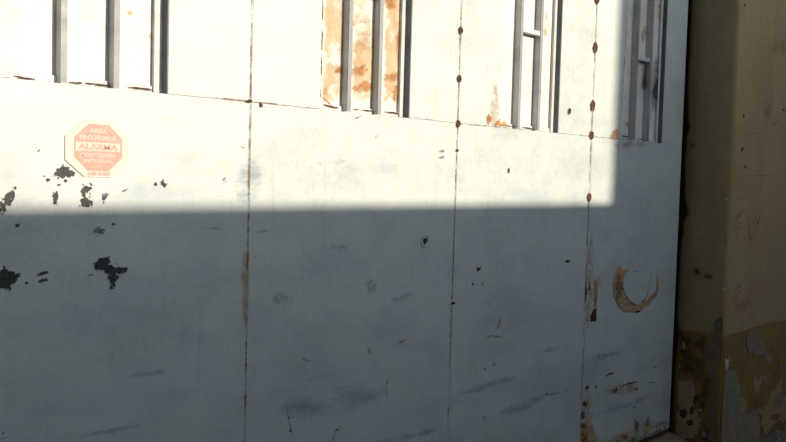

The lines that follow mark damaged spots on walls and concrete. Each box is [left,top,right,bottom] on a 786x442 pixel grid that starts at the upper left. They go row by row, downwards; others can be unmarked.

rust [224,24,277,108]
rust [320,0,344,108]
rust [352,30,374,97]
rust [385,0,399,100]
rust [475,115,536,131]
rust [580,91,595,165]
peeling [0,186,17,215]
peeling [44,164,75,205]
peeling [80,182,109,207]
peeling [0,266,28,292]
peeling [89,256,128,289]
spalling [676,379,707,439]